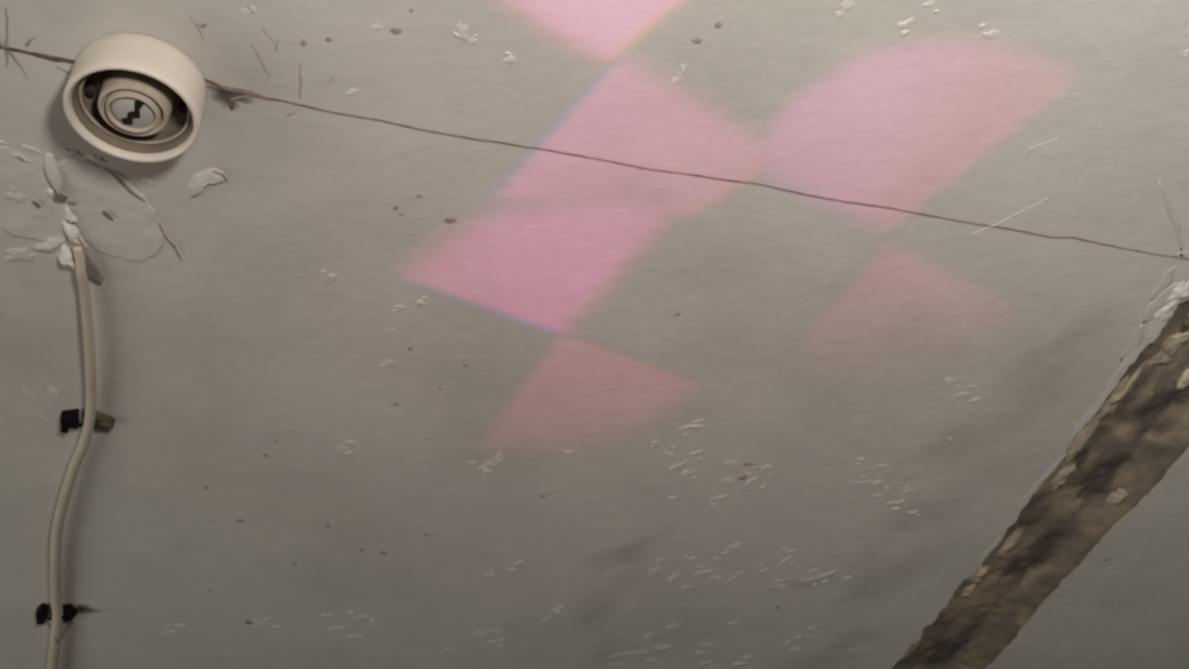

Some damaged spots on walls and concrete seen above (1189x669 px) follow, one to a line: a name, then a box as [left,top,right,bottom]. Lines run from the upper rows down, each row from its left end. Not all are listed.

crack [0,7,75,78]
peeling [0,140,182,284]
crack [204,78,1189,260]
spalling [892,281,1189,669]